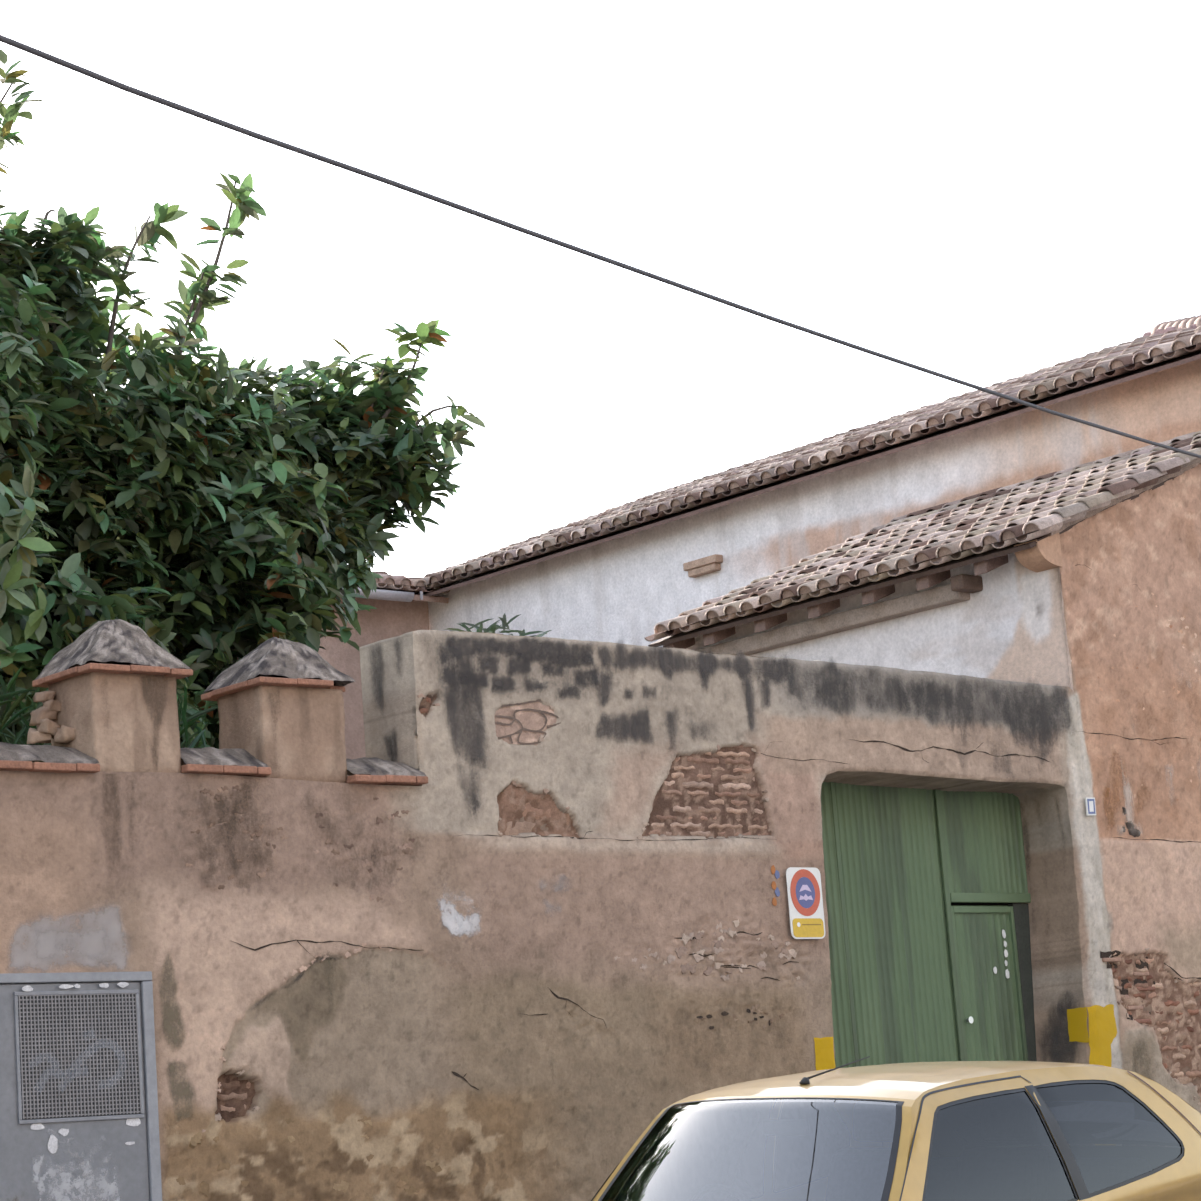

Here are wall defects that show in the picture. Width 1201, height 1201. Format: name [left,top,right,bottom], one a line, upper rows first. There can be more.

spalling [417,693,440,717]
spalling [495,699,561,745]
water stain [441,637,801,763]
crack [754,739,1049,764]
water stain [815,661,1070,755]
crack [1072,731,1189,745]
spalling [497,781,580,839]
spalling [636,745,773,840]
crack [232,940,420,954]
water stain [1043,999,1076,1063]
spalling [1100,948,1201,1102]
spalling [189,1046,260,1148]